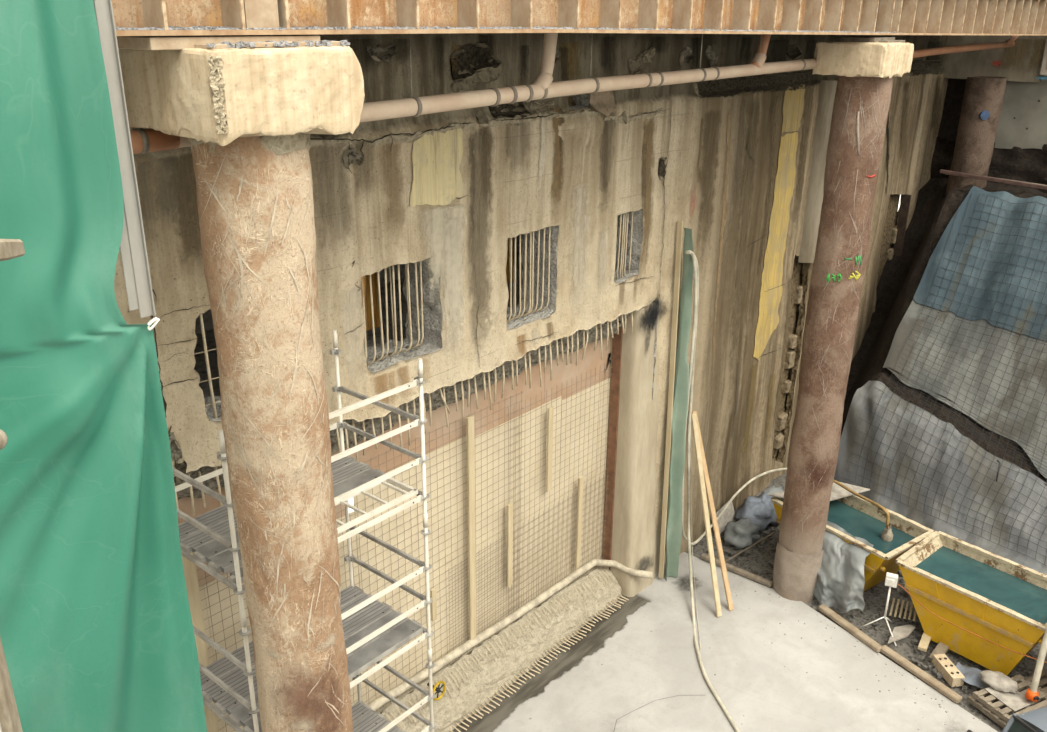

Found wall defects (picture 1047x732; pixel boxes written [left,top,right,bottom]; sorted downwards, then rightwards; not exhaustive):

spalling [208,56,229,134]
crack [310,110,573,173]
water stain [424,127,493,333]
spalling [450,43,503,93]
water stain [701,112,731,343]
peeling [679,44,820,360]
water stain [732,97,779,345]
water stain [797,87,813,212]
crack [151,289,208,481]
spalling [330,312,631,452]
water stain [641,297,666,350]
spalling [169,432,231,500]